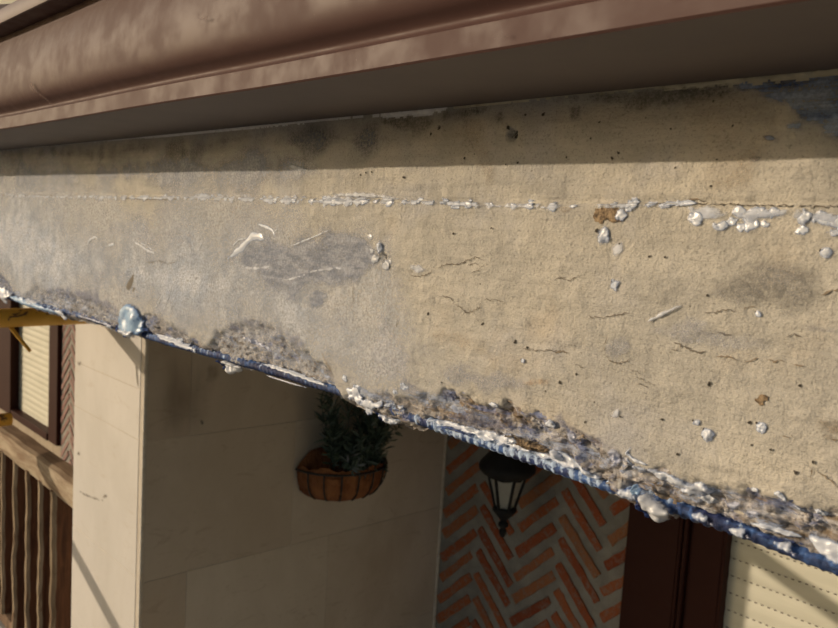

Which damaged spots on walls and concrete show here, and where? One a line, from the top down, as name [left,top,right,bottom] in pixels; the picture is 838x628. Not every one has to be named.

leakage [739,75,838,136]
peeling [593,198,670,224]
peeling [688,205,780,232]
peeling [795,211,838,236]
leakage [0,150,406,388]
crack [412,256,484,277]
spalling [0,273,16,296]
spalling [27,285,119,333]
spalling [132,314,838,554]